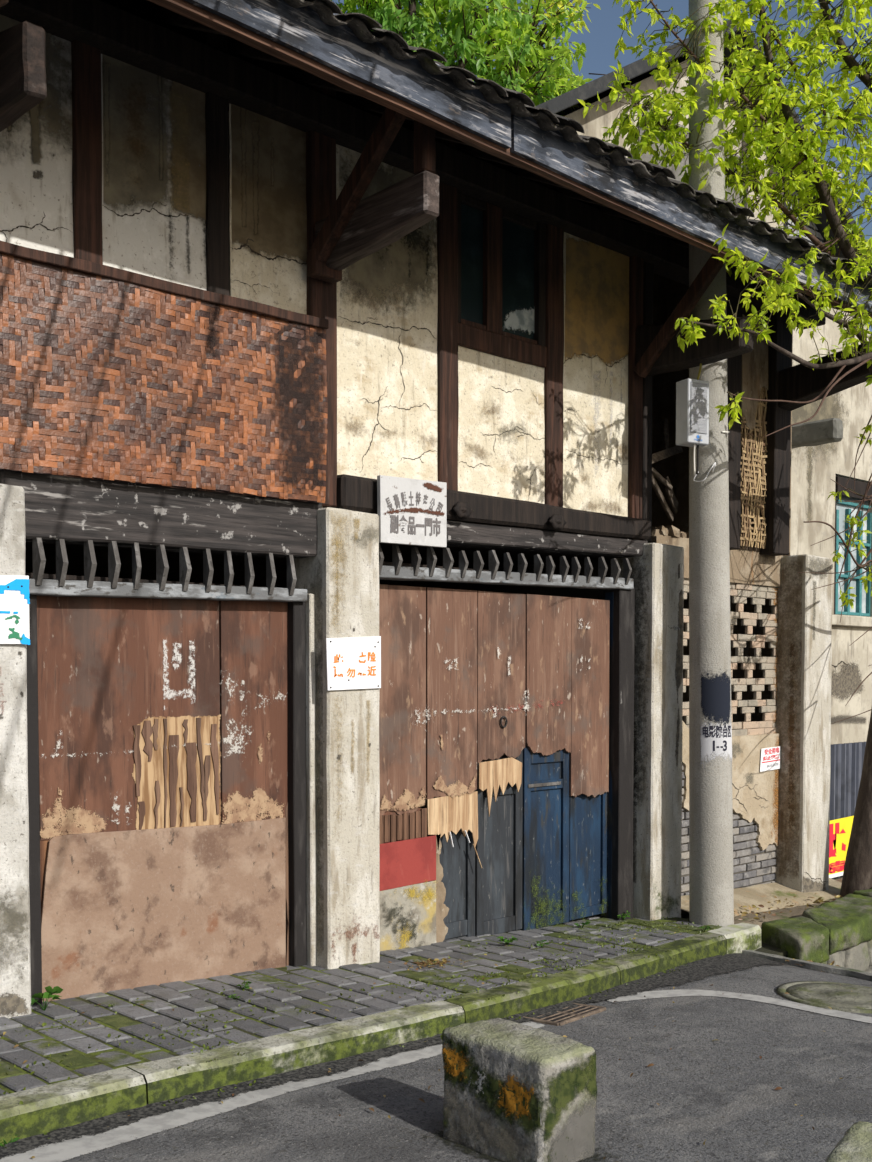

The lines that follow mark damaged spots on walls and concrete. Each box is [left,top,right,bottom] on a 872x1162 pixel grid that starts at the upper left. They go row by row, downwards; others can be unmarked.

water stain [29,104,42,164]
crack [0,212,74,242]
crack [103,203,192,225]
water stain [205,305,220,357]
water stain [271,324,325,492]
crack [338,316,437,469]
crack [400,426,541,468]
peeling [40,787,107,839]
peeling [222,787,285,824]
peeling [380,776,476,811]
flaking render [733,813,777,888]
water stain [0,898,26,961]